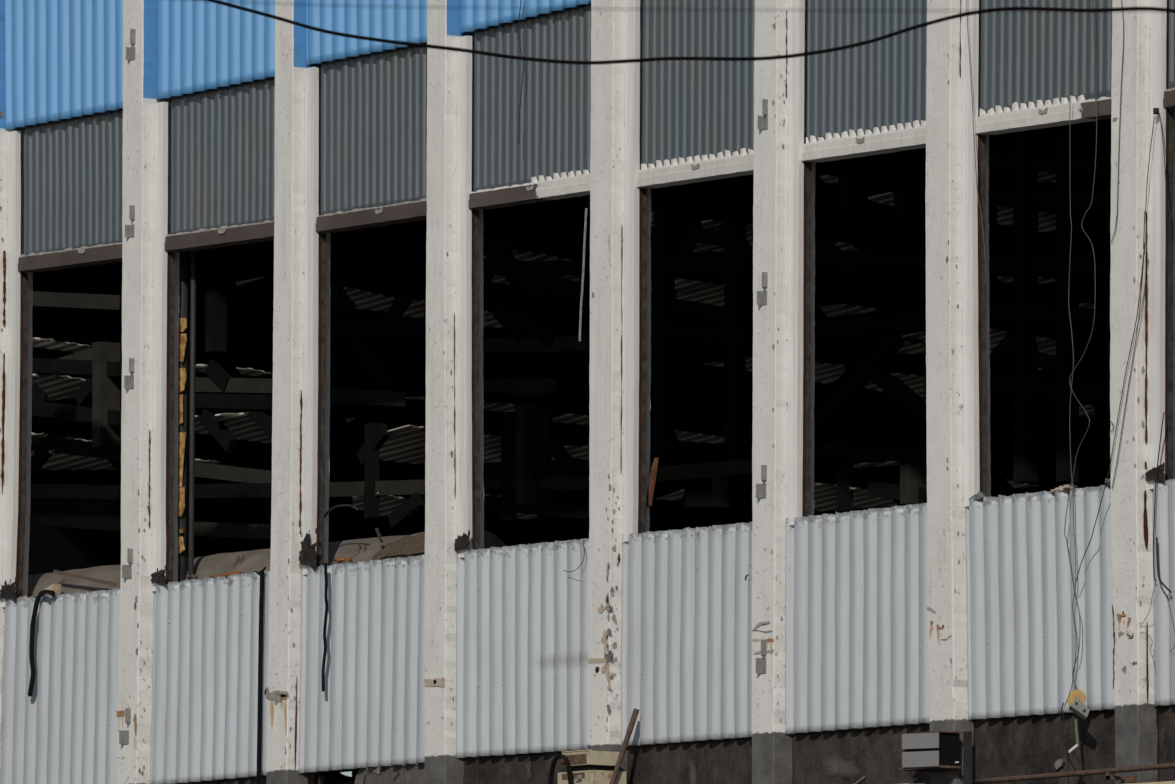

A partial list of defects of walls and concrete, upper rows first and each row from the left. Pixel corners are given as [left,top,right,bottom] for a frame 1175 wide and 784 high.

spalling [598,474,620,690]
rust [270,678,297,765]